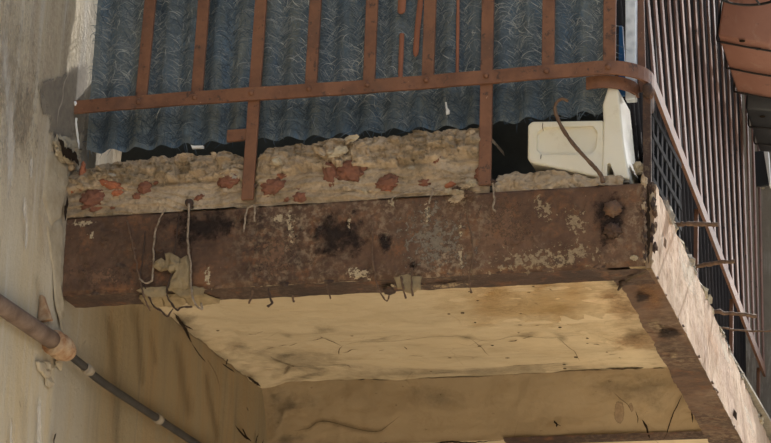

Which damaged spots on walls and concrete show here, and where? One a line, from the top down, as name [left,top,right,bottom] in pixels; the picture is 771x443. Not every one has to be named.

spalling [553,97,606,183]
spalling [39,64,88,334]
rust [175,209,247,246]
rust [313,211,365,256]
rust [379,234,391,250]
rust [595,202,624,243]
crack [251,332,378,380]
crack [373,335,657,375]
crack [297,418,397,432]
crack [437,435,501,443]
crack [614,393,693,438]